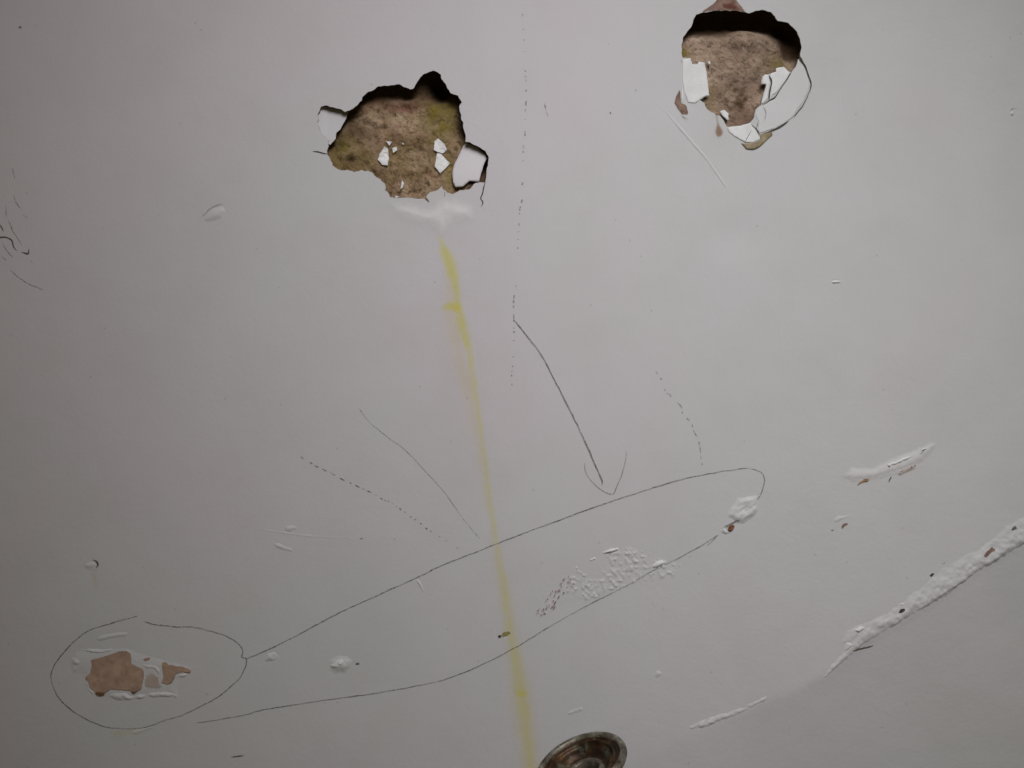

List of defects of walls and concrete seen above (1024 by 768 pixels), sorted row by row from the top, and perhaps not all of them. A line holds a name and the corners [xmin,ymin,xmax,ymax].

spalling [313,71,489,207]
spalling [675,0,812,150]
peeling [70,632,191,701]